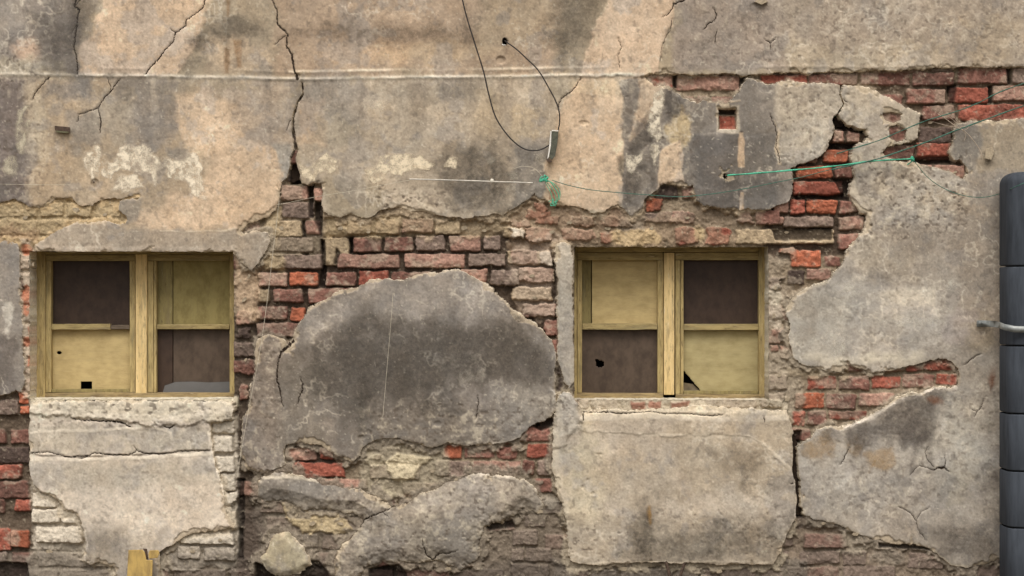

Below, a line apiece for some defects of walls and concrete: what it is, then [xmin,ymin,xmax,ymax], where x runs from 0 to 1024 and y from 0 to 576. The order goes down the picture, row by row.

crack [72,0,80,74]
crack [145,0,205,75]
crack [273,1,299,80]
crack [77,80,119,133]
efflorescence [83,145,206,199]
crack [287,117,300,183]
damp [626,88,678,189]
flaking render [101,66,1024,576]
flaking render [0,194,147,576]
crack [276,339,304,406]
crack [791,435,802,515]
crack [910,449,947,475]